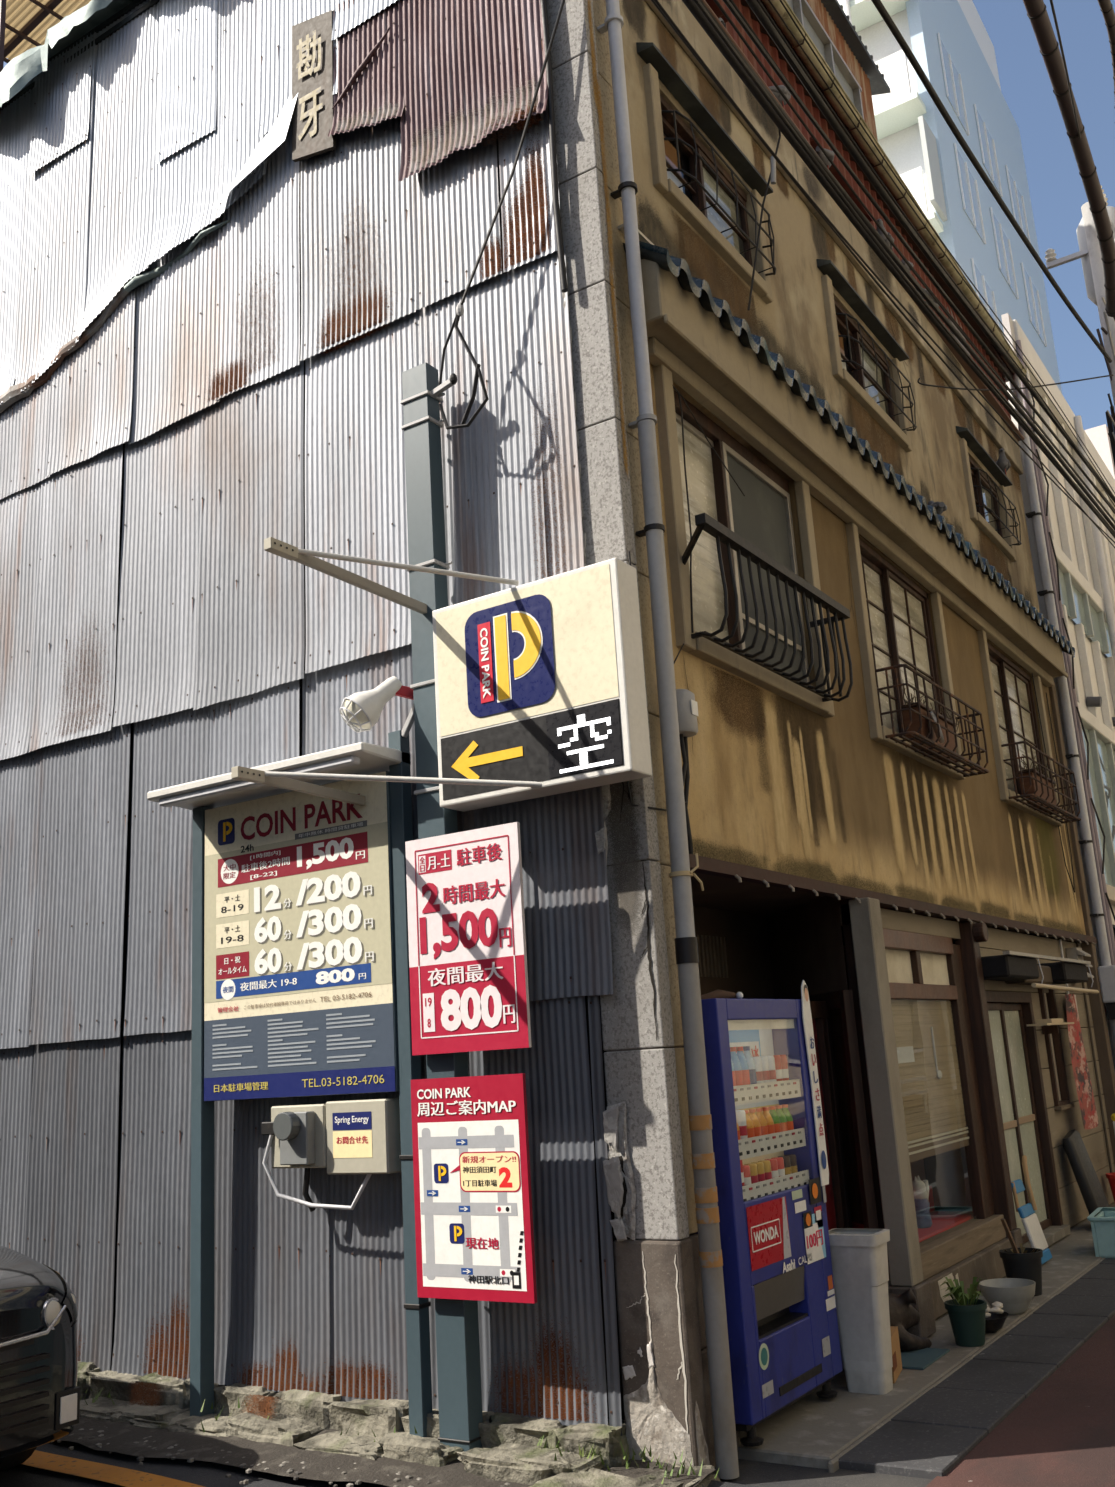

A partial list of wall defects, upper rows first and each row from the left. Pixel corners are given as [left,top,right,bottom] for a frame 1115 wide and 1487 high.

rust [476,83,555,279]
rust [205,234,287,402]
rust [316,183,399,356]
rust [522,344,577,581]
water stain [692,664,1084,934]
spalling [603,1101,636,1242]
rust [228,1334,398,1419]
rust [486,1314,605,1423]
crack [626,1251,688,1433]